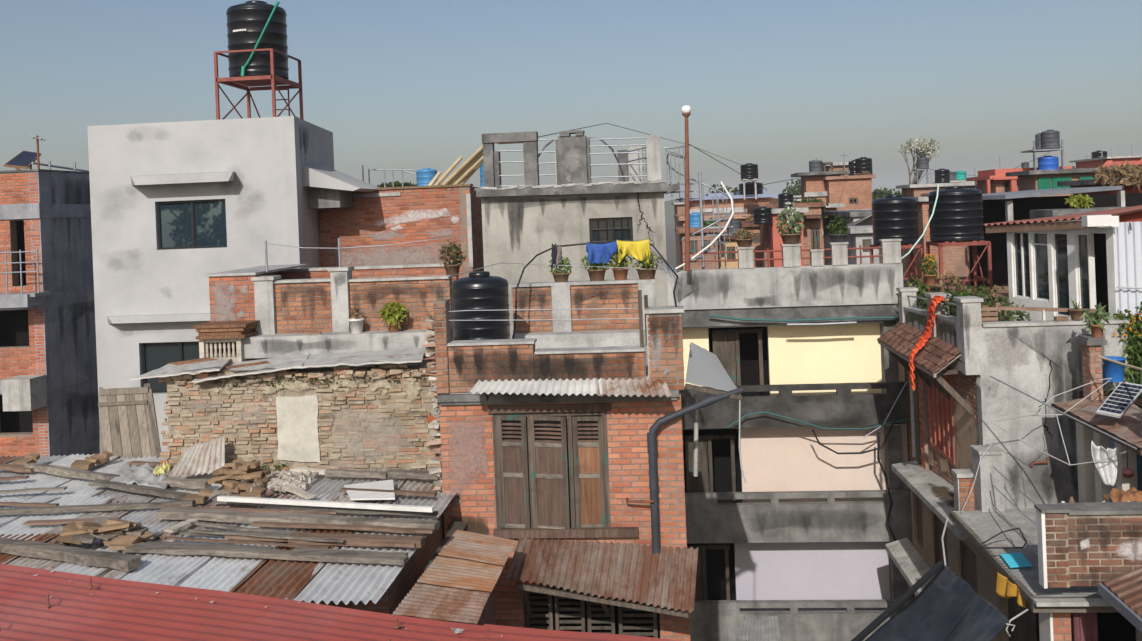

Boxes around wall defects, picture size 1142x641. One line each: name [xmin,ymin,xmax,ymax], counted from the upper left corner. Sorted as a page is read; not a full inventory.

peeling [375,208,459,231]
crack [637,192,655,243]
peeling [213,286,246,321]
leakage [454,349,613,382]
crack [1037,360,1053,452]